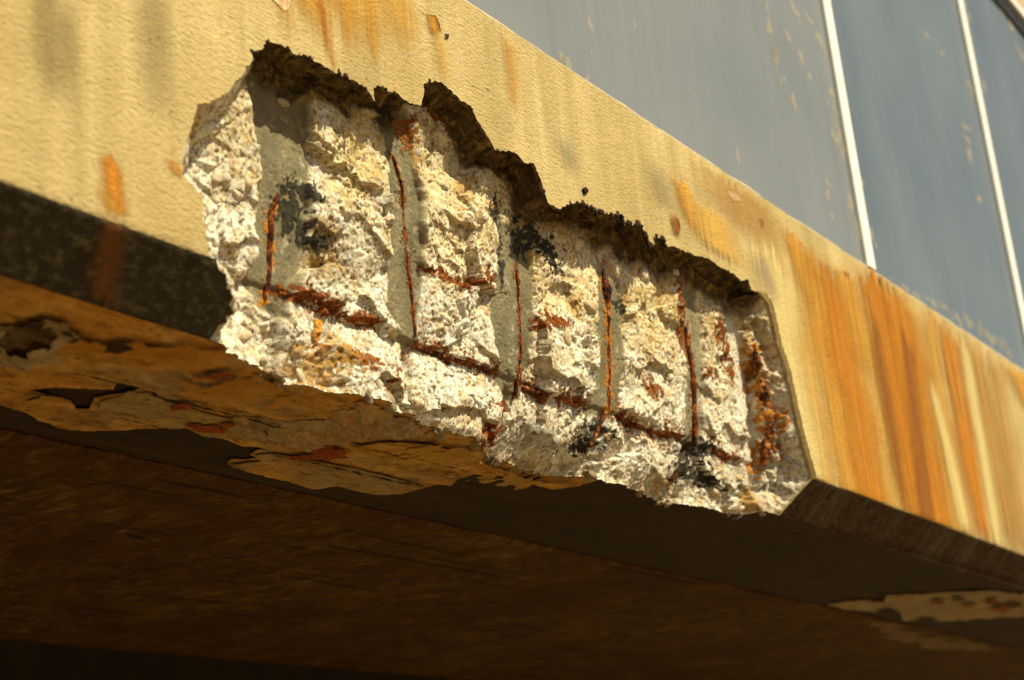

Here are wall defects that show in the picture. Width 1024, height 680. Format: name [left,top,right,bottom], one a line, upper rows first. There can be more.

rust [103,155,125,214]
rust [672,179,763,260]
spalling [0,39,810,520]
rust [417,264,497,293]
rust [528,308,585,334]
rust [673,269,687,357]
rust [698,301,738,387]
rust [641,377,666,401]
rust [784,227,1024,547]
rust [392,402,506,478]
rust [477,473,569,490]
peeling [827,590,1024,651]